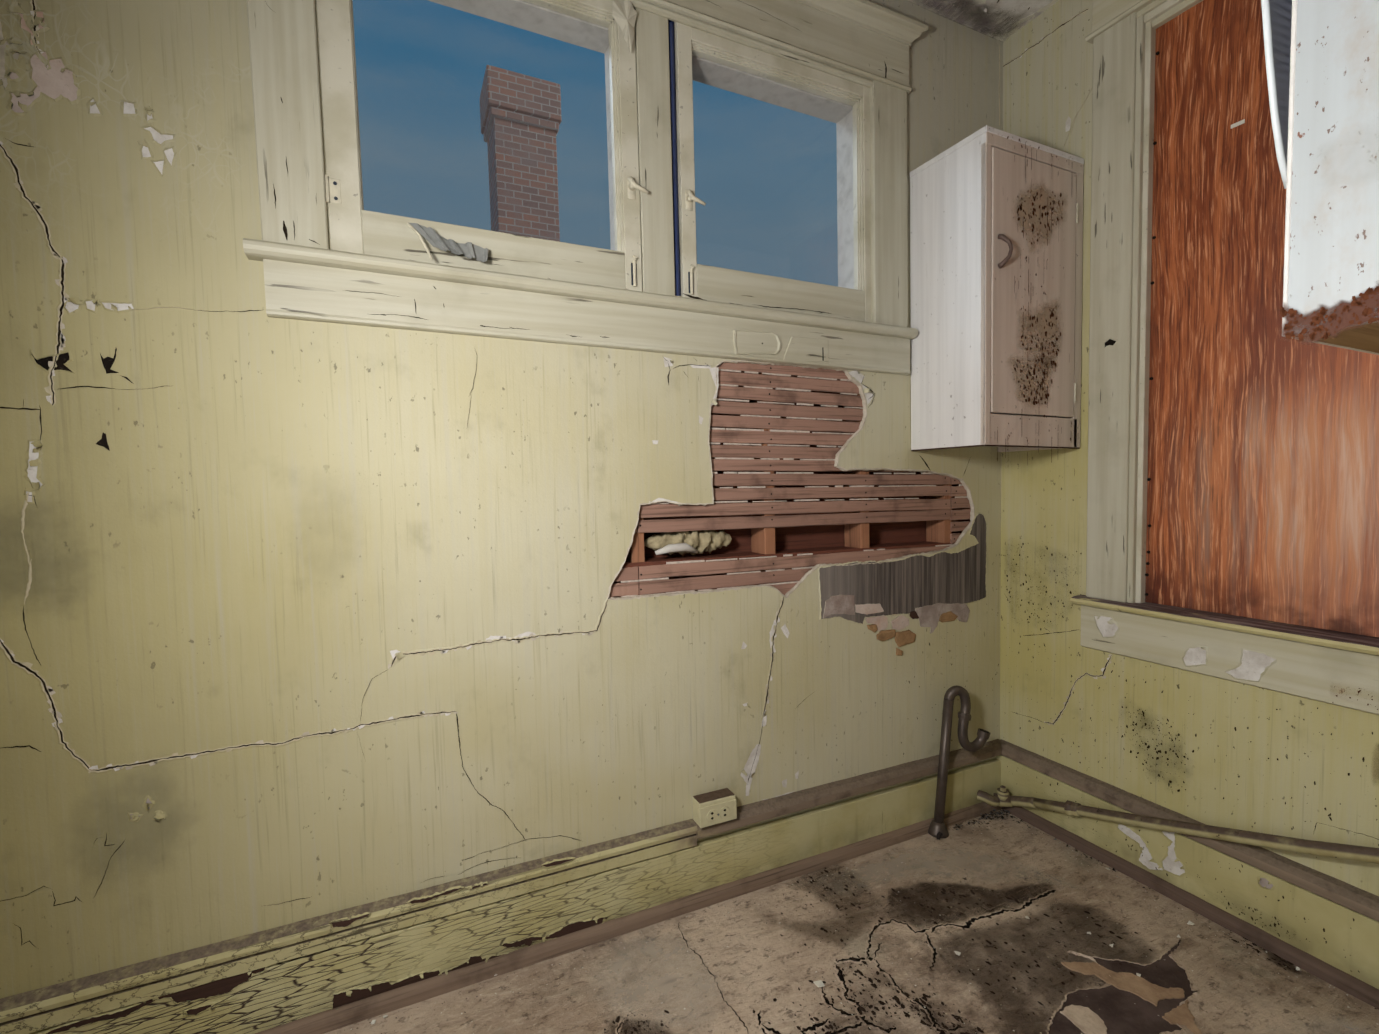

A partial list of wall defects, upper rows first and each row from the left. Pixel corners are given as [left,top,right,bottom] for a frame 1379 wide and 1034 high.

crack [0,134,163,440]
flaking render [607,360,987,656]
crack [0,492,609,879]
crack [748,596,809,781]
crack [1013,654,1113,726]
water stain [1122,706,1188,792]
peeling [1116,823,1187,878]
peeling [43,967,267,1034]
peeling [330,915,610,1010]
spalling [753,955,984,1034]
crack [755,889,1057,1034]
water stain [781,866,1158,1034]